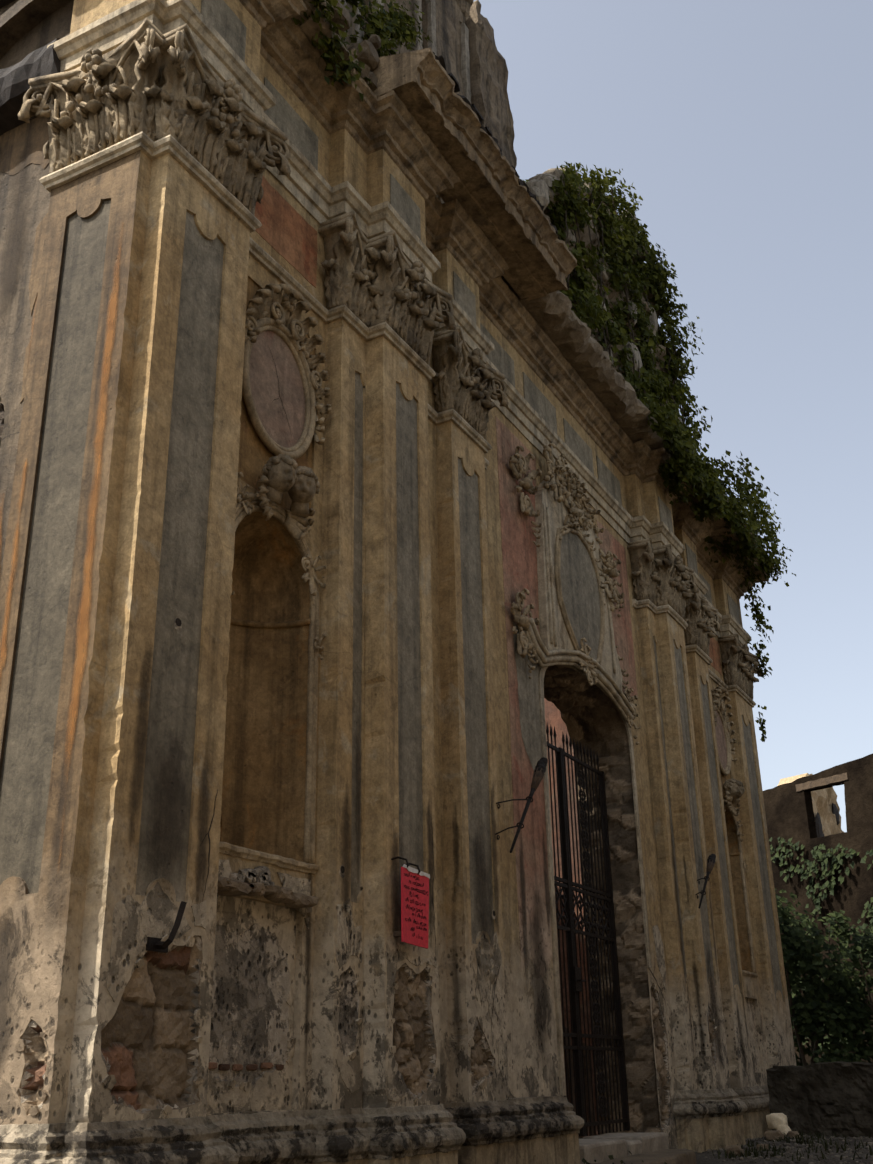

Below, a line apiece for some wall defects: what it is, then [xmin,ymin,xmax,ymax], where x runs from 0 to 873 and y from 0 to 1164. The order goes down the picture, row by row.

flaking render [101,882,284,1114]
flaking render [386,950,438,1105]